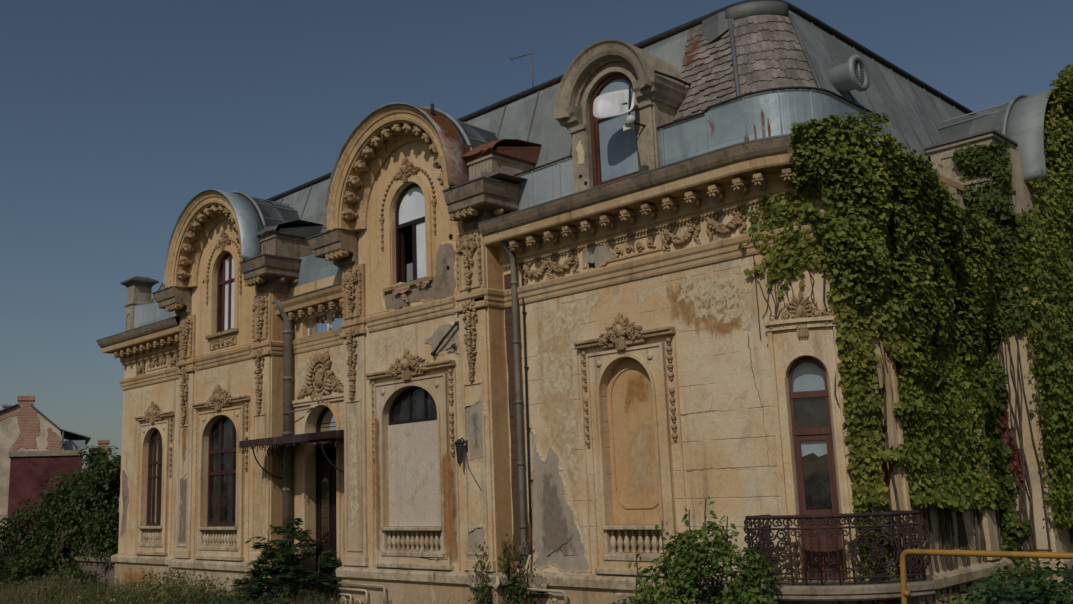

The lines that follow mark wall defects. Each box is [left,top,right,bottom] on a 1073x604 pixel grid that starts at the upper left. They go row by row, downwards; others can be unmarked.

peeling [380,234,457,312]
flaking render [503,271,518,290]
peeling [676,264,752,331]
crack [686,334,770,472]
peeling [504,305,593,604]